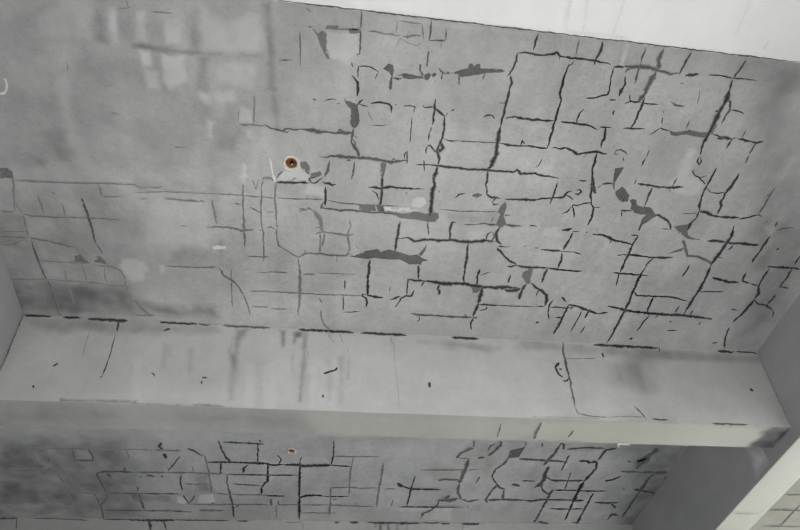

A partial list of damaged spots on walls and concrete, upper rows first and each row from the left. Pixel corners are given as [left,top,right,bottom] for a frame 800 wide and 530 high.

spalling [384,51,505,90]
spalling [345,99,360,128]
crack [0,11,800,421]
spalling [613,167,656,231]
spalling [350,245,428,266]
crack [713,420,748,428]
spalling [508,442,527,458]
crack [7,422,667,530]